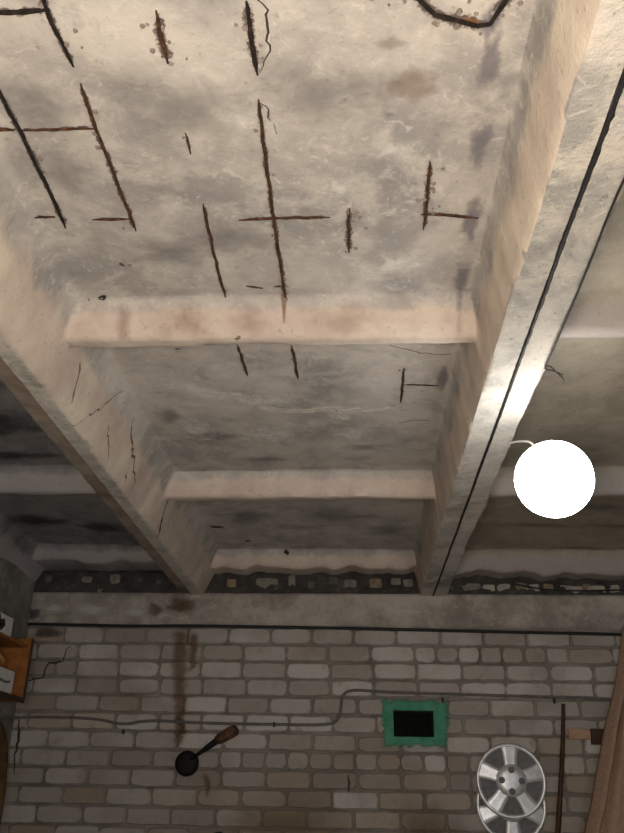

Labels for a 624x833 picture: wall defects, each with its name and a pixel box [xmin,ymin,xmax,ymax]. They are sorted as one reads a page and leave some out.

crack [67,363,122,459]
crack [124,418,136,485]
rust [175,633,196,743]